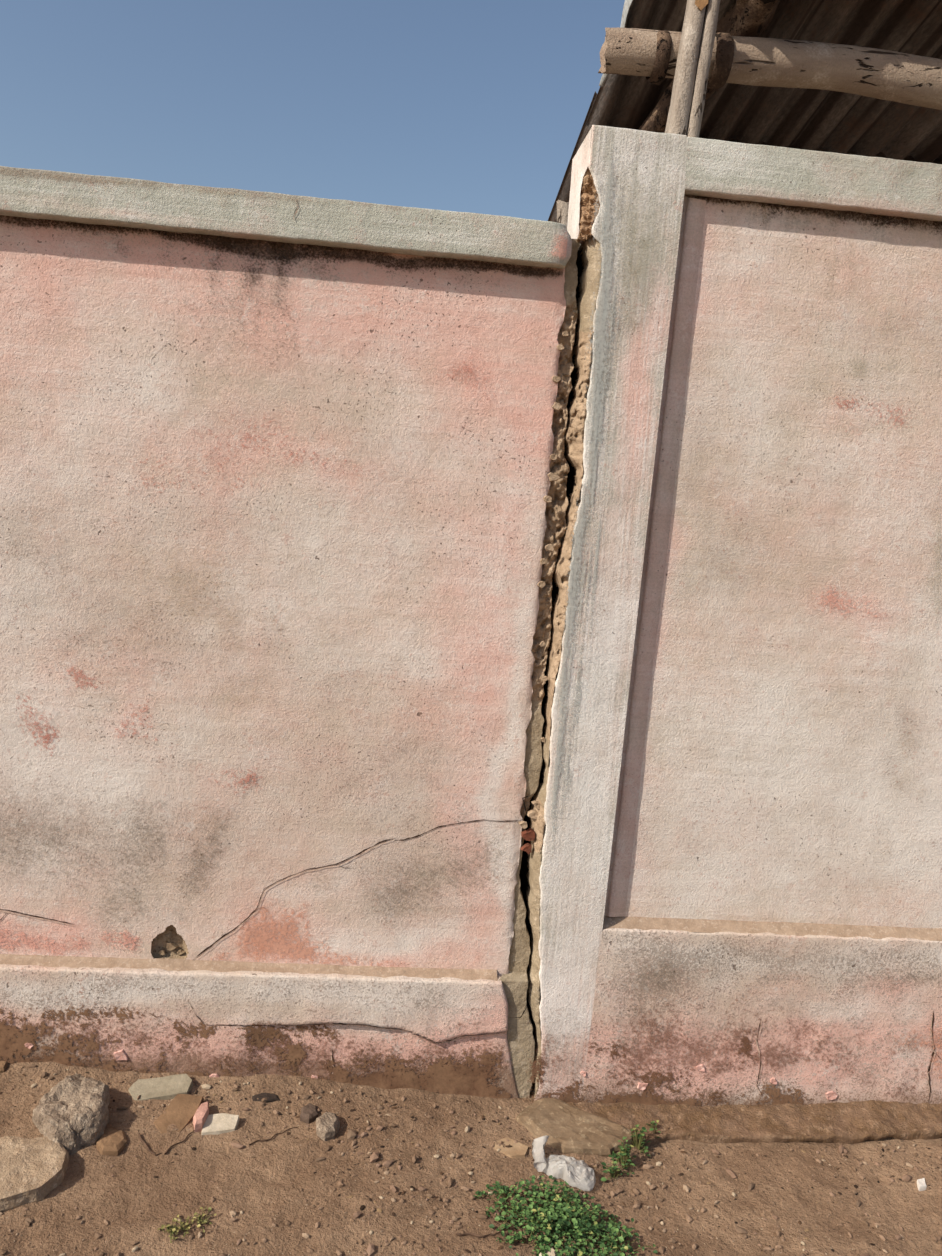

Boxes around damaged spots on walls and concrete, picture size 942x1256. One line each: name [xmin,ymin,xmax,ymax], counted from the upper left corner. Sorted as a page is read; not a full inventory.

damp [0,215,563,286]
crack [194,249,584,1074]
damp [29,1008,382,1074]
damp [610,1009,859,1088]